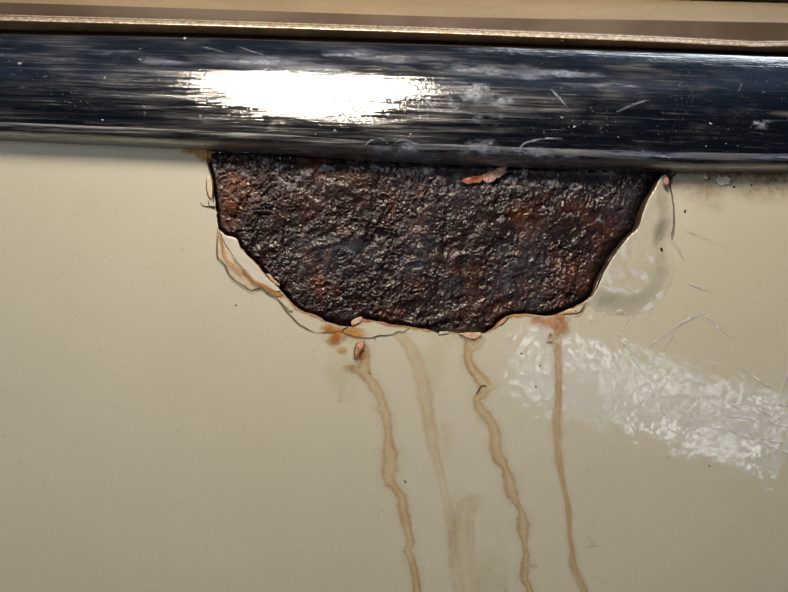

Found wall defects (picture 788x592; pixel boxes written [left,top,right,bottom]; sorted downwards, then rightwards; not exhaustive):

peeling [206,151,669,340]
corrosion [288,300,434,353]
corrosion [490,314,567,343]